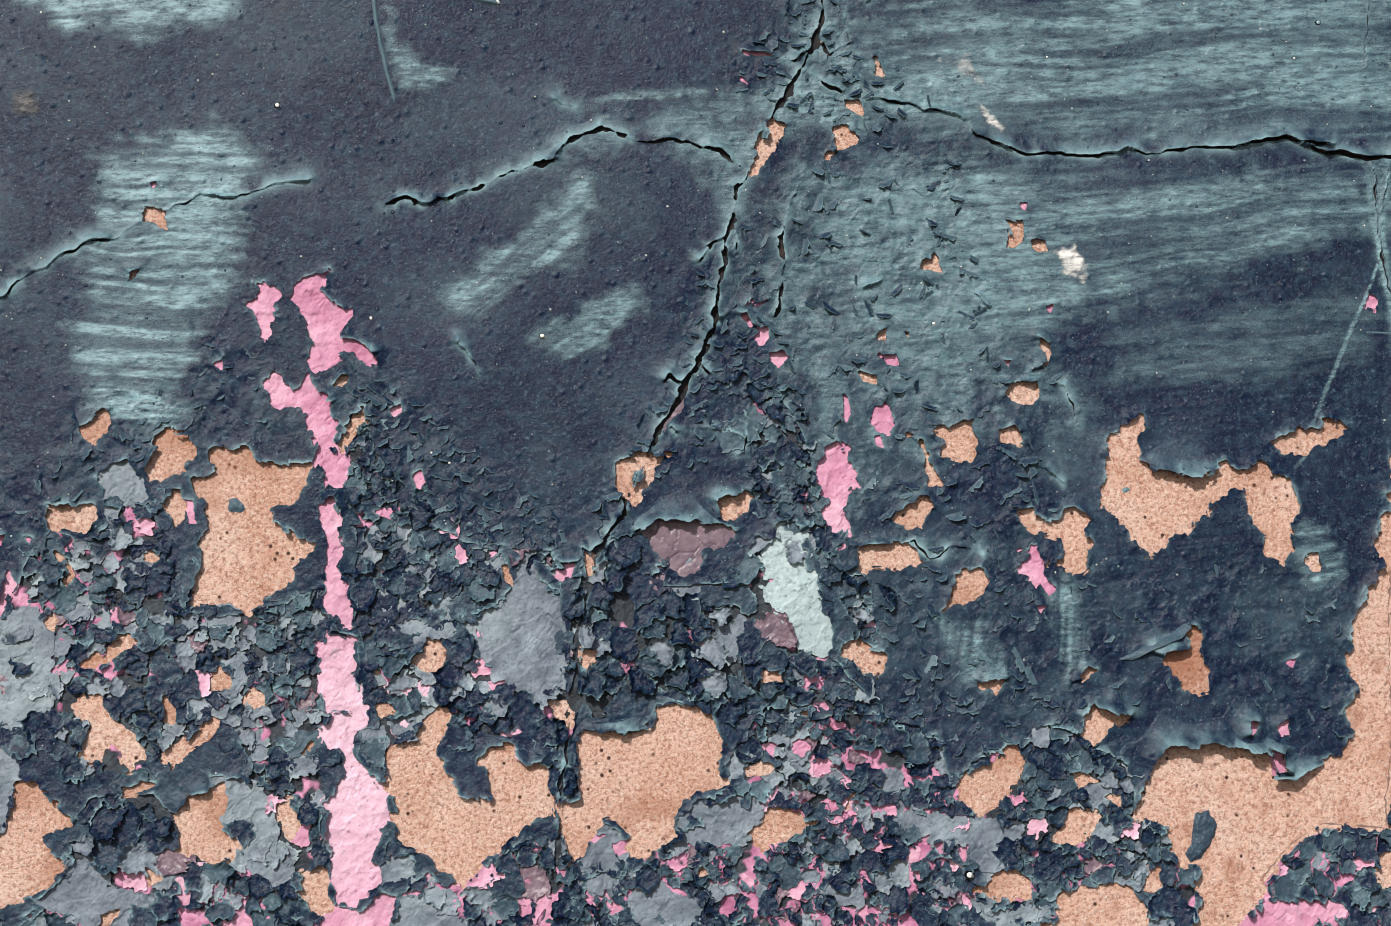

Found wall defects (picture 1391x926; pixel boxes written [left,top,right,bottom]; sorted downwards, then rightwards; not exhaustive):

crack [0,174,317,307]
peeling [739,0,907,214]
peeling [925,159,965,217]
crack [764,0,1391,341]
crack [376,93,806,555]
crack [1028,460,1070,492]
crack [1056,380,1086,433]
peeling [0,210,1391,926]
crack [900,534,990,566]
crack [1383,570,1391,705]
crack [552,693,581,862]
crack [1262,740,1391,879]